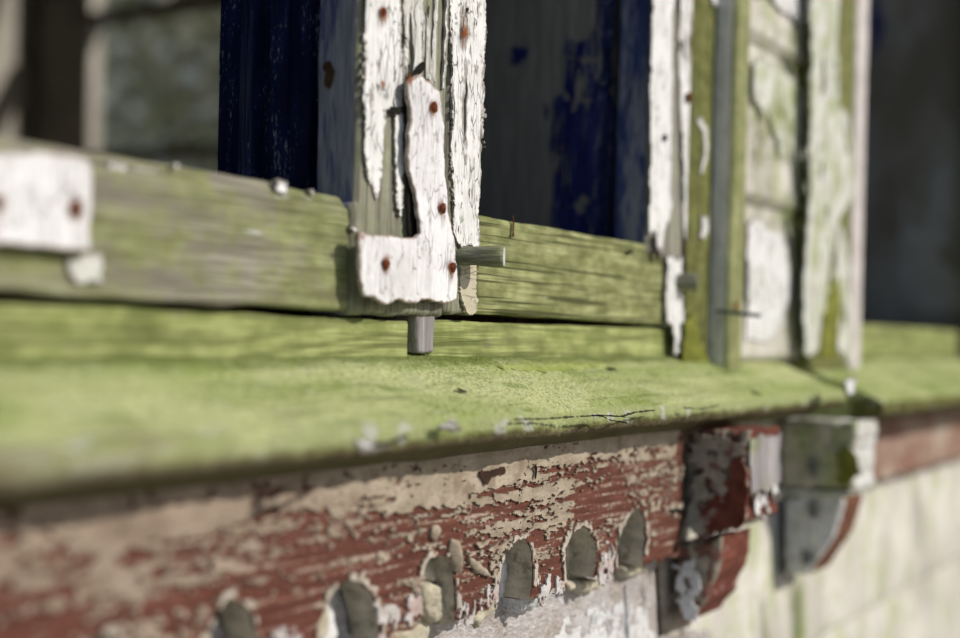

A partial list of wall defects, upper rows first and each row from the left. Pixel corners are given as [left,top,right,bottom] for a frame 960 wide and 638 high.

peeling [360,0,488,248]
peeling [544,0,616,239]
peeling [647,0,709,355]
peeling [744,0,855,362]
peeling [0,430,782,638]
crack [513,409,655,424]